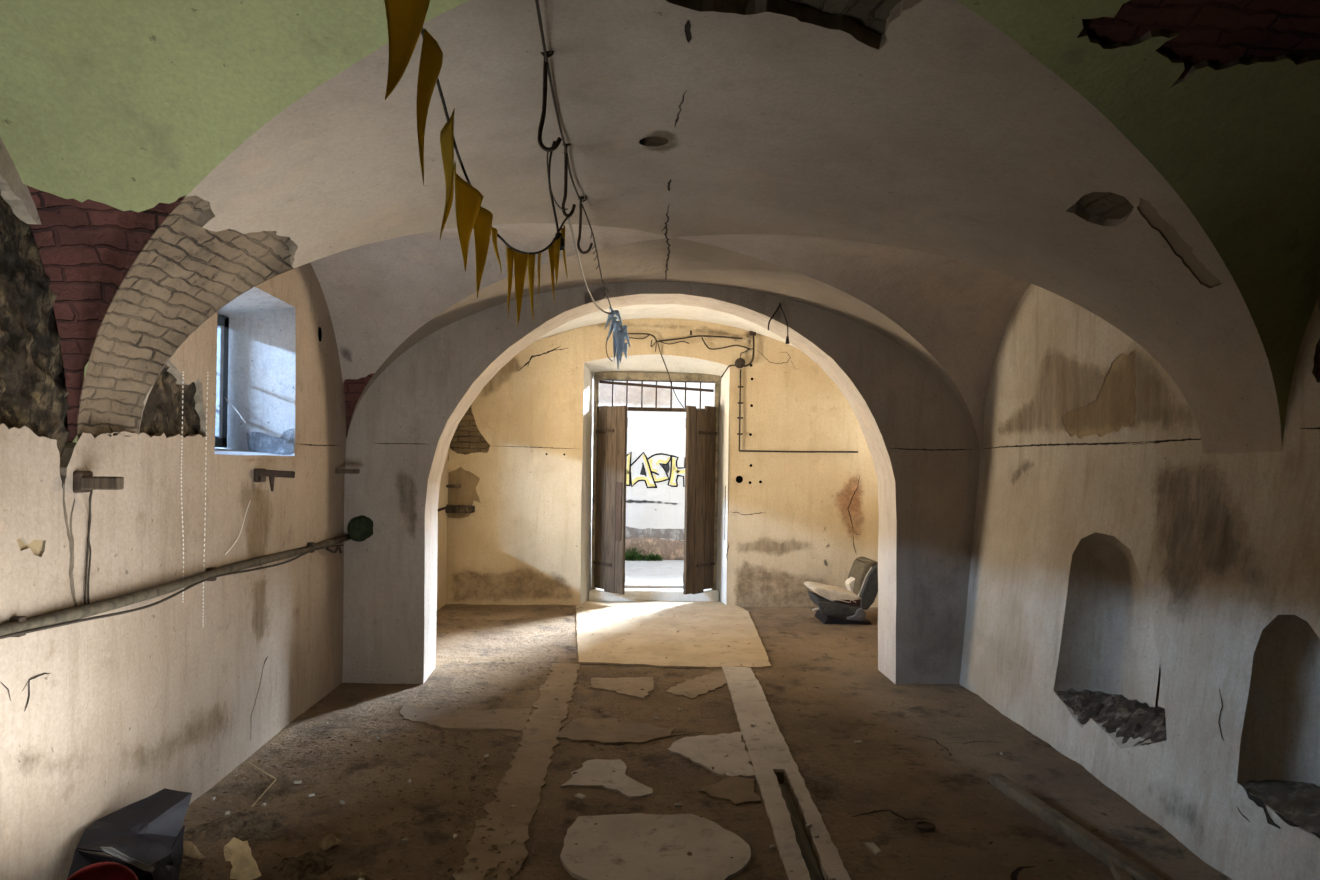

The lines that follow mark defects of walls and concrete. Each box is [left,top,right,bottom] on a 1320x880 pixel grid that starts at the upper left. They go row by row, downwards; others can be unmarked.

spalling [666,0,923,50]
spalling [1077,0,1320,88]
spalling [0,175,298,488]
spalling [447,406,490,518]